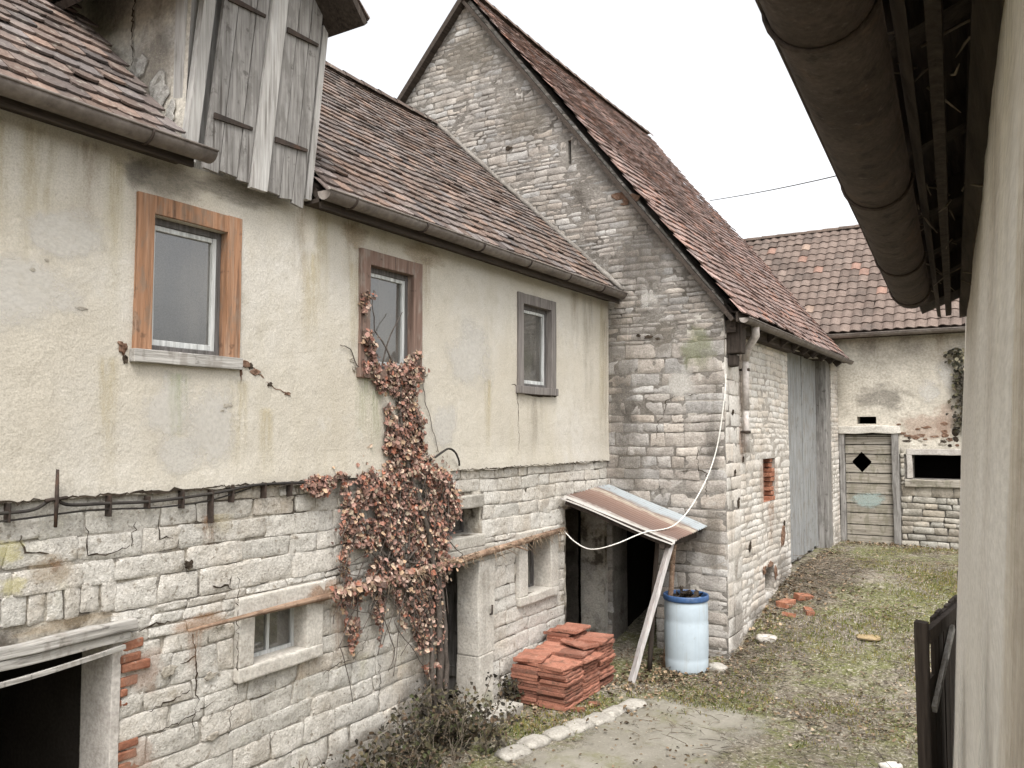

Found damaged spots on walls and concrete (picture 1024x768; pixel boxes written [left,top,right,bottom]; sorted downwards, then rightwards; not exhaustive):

spalling [896,417,962,447]
crack [19,535,49,554]
crack [85,519,173,556]
crack [139,621,170,632]
crack [149,577,240,734]